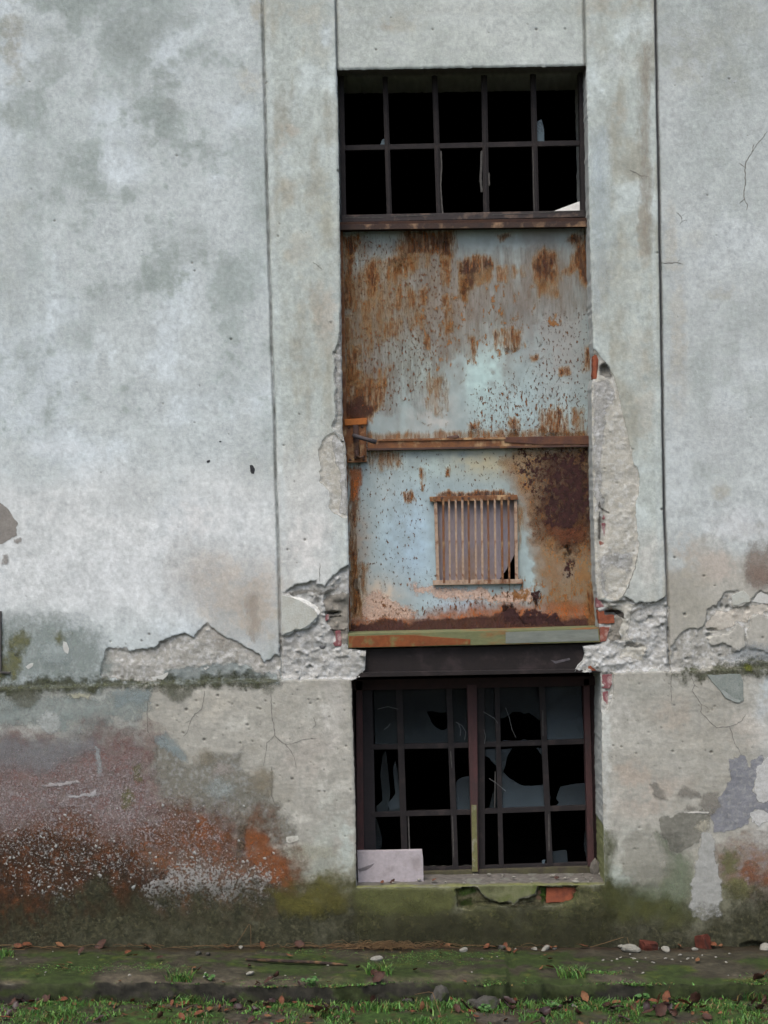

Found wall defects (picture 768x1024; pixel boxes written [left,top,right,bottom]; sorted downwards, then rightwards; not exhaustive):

crack [740,132,767,210]
spalling [318,310,348,519]
rust [343,230,595,631]
peeling [0,503,21,564]
spalling [551,349,768,712]
spalling [0,565,366,734]
crack [263,698,316,811]
peeling [651,782,665,799]
peeling [659,755,768,852]
spalling [456,880,579,908]
water stain [689,832,722,916]